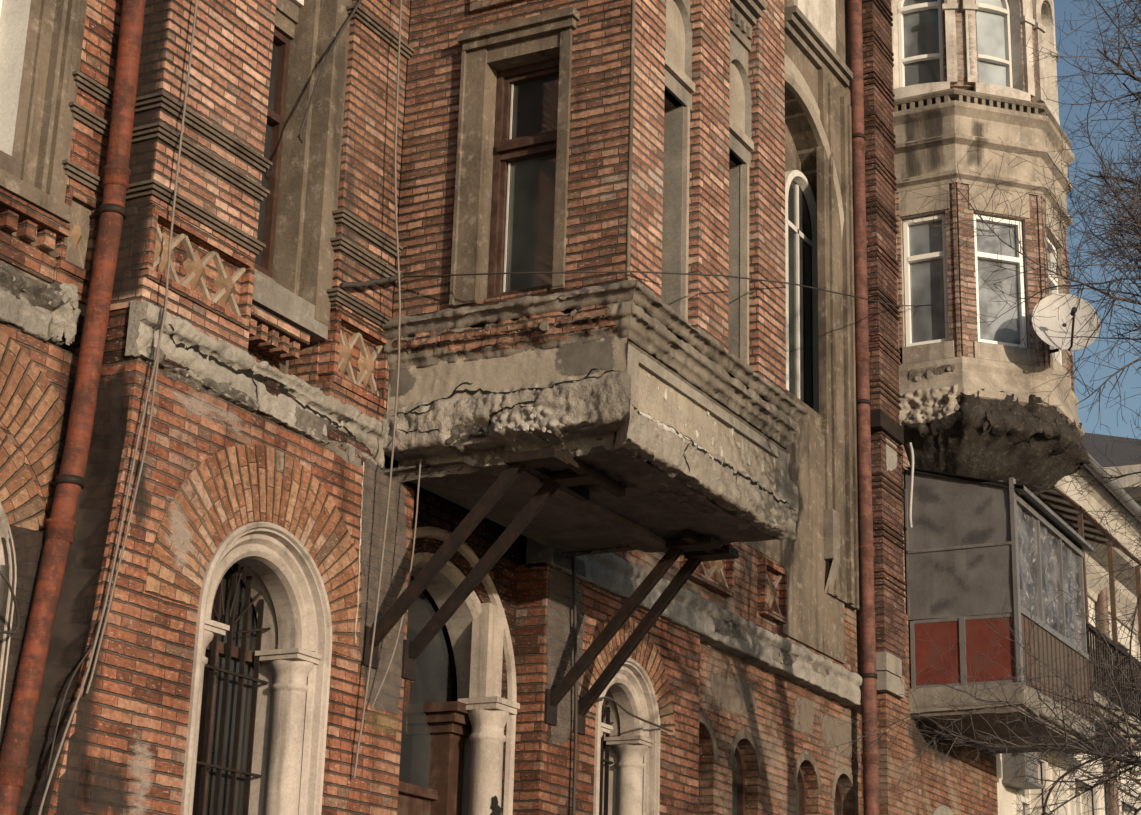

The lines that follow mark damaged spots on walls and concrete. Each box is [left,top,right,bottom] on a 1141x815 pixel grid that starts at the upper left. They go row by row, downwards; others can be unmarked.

spalling [0,264,81,346]
spalling [146,346,260,412]
spalling [295,405,361,468]
crack [397,368,615,434]
spalling [445,405,573,460]
peeling [640,374,789,503]
spalling [899,364,960,425]